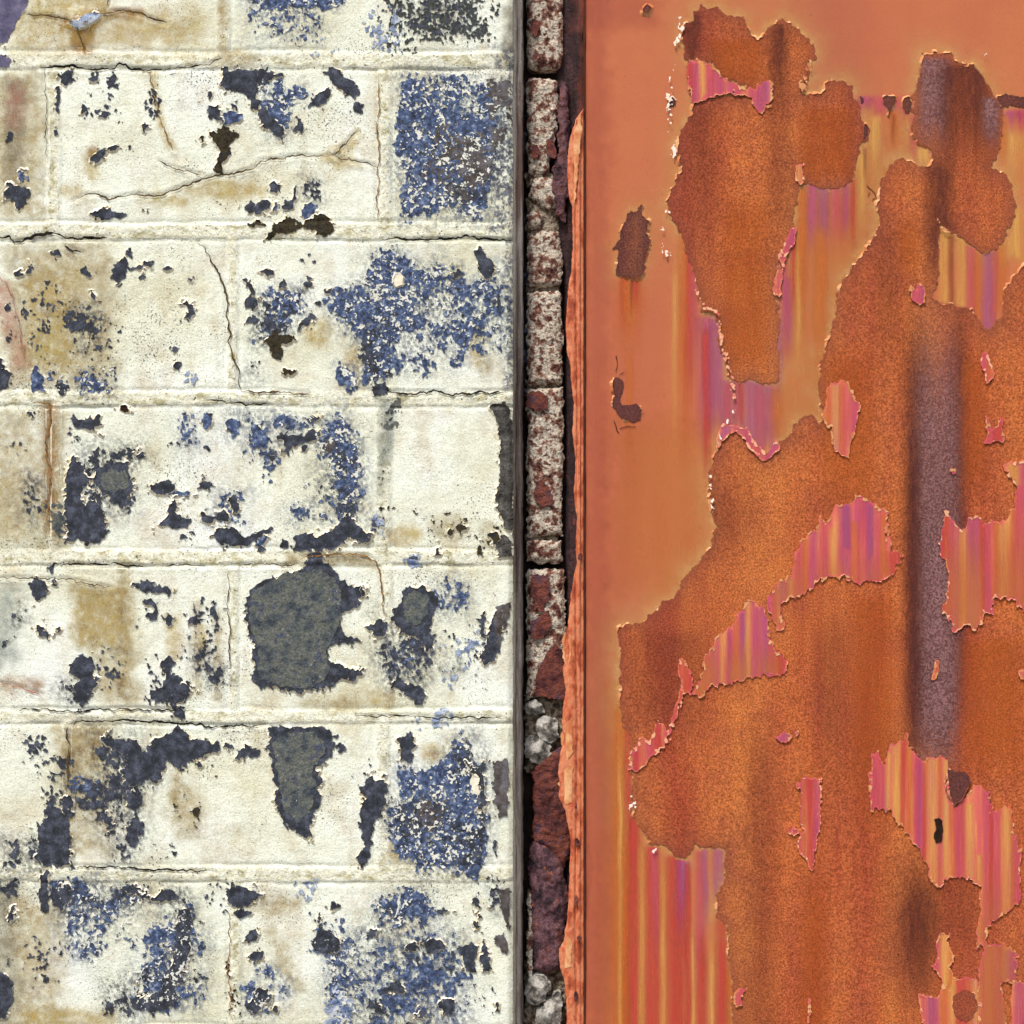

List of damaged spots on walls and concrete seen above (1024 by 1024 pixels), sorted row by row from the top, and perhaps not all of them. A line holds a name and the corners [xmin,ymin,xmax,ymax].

crack [198,243,309,406]
crack [28,0,512,241]
peeling [195,64,364,177]
peeling [392,72,513,224]
rust [682,254,720,448]
rust [781,185,839,317]
rust [931,166,948,302]
rust [920,58,1024,148]
peeling [0,243,514,1024]
peeling [609,3,1024,1024]
rust [908,359,962,757]
rust [616,718,732,1024]